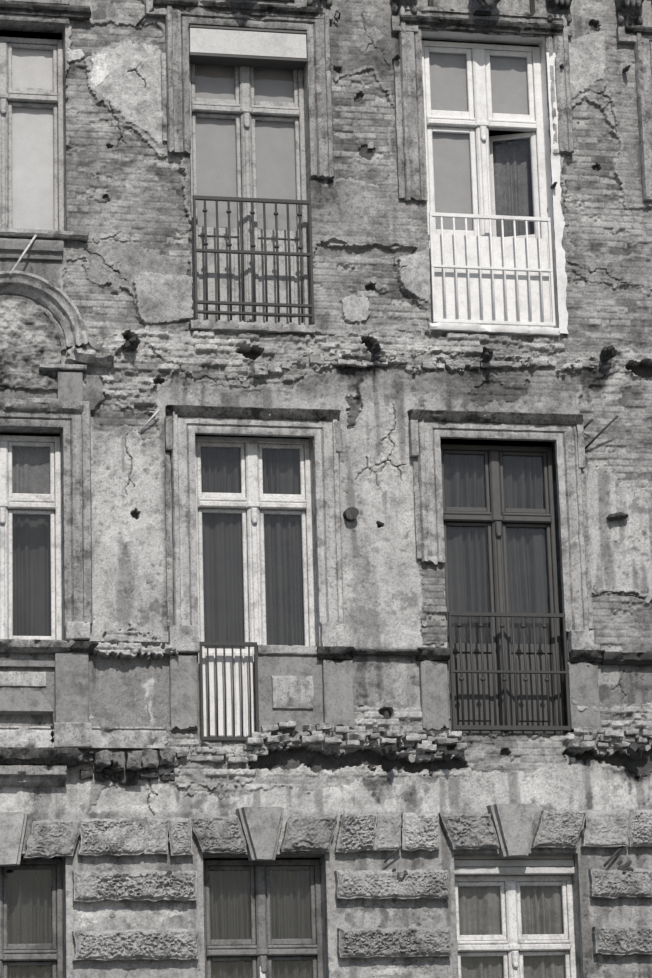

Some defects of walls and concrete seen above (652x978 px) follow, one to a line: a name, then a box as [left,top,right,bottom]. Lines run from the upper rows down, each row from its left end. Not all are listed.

crack [128,61,147,88]
crack [109,101,127,151]
crack [584,87,618,134]
crack [82,231,137,284]
spalling [63,0,652,493]
spalling [0,299,62,392]
crack [355,403,407,486]
peeling [355,451,400,507]
spalling [419,560,447,648]
spalling [589,591,652,652]
spalling [87,700,652,814]